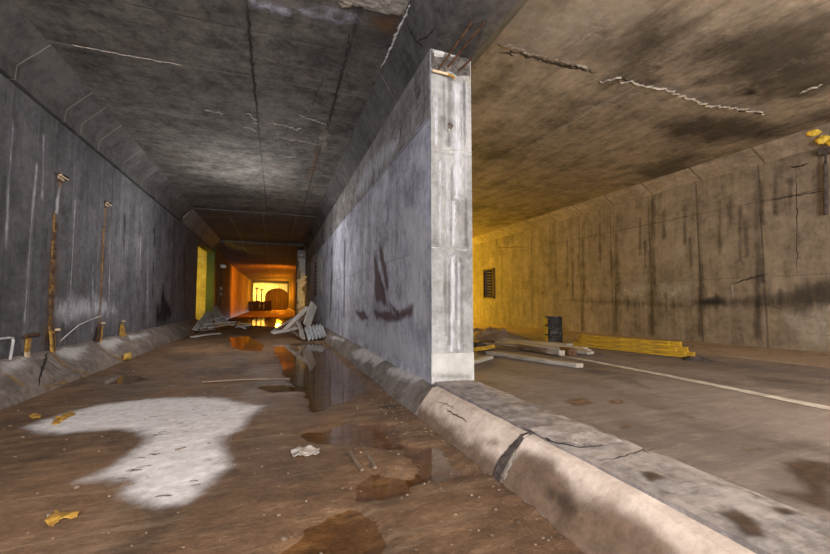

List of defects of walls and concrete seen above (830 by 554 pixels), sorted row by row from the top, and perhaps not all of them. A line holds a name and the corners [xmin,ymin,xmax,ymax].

crack [72,45,182,66]
crack [244,4,358,158]
spalling [339,0,410,16]
crack [381,5,434,69]
crack [502,48,773,115]
crack [766,163,823,274]
rust [48,182,61,337]
leakage [736,270,829,342]
crack [39,352,60,385]